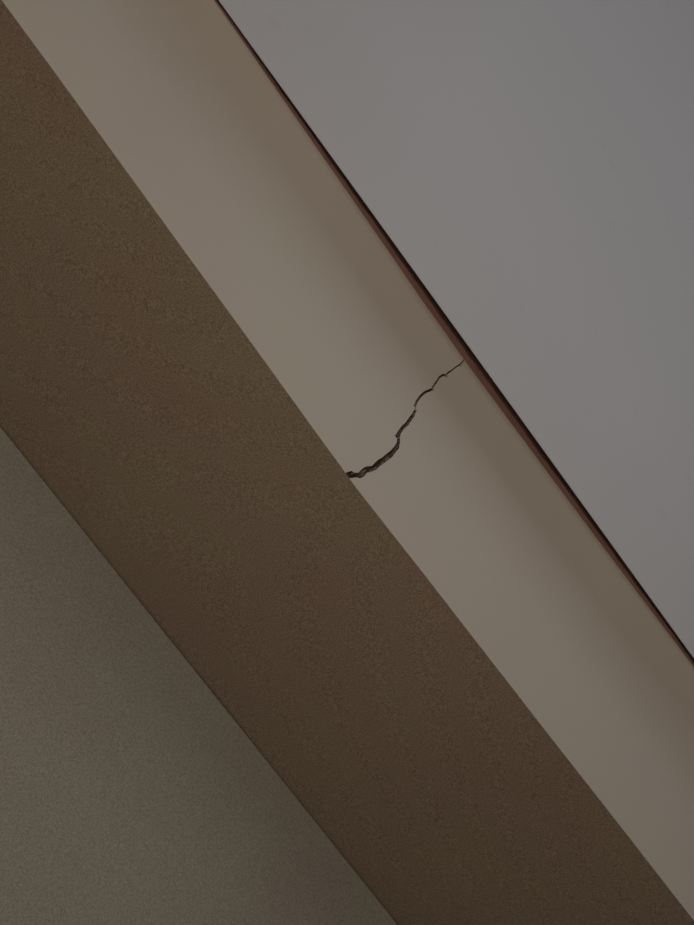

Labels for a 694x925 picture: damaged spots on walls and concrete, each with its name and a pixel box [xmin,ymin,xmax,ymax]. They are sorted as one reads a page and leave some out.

crack [346,361,463,478]